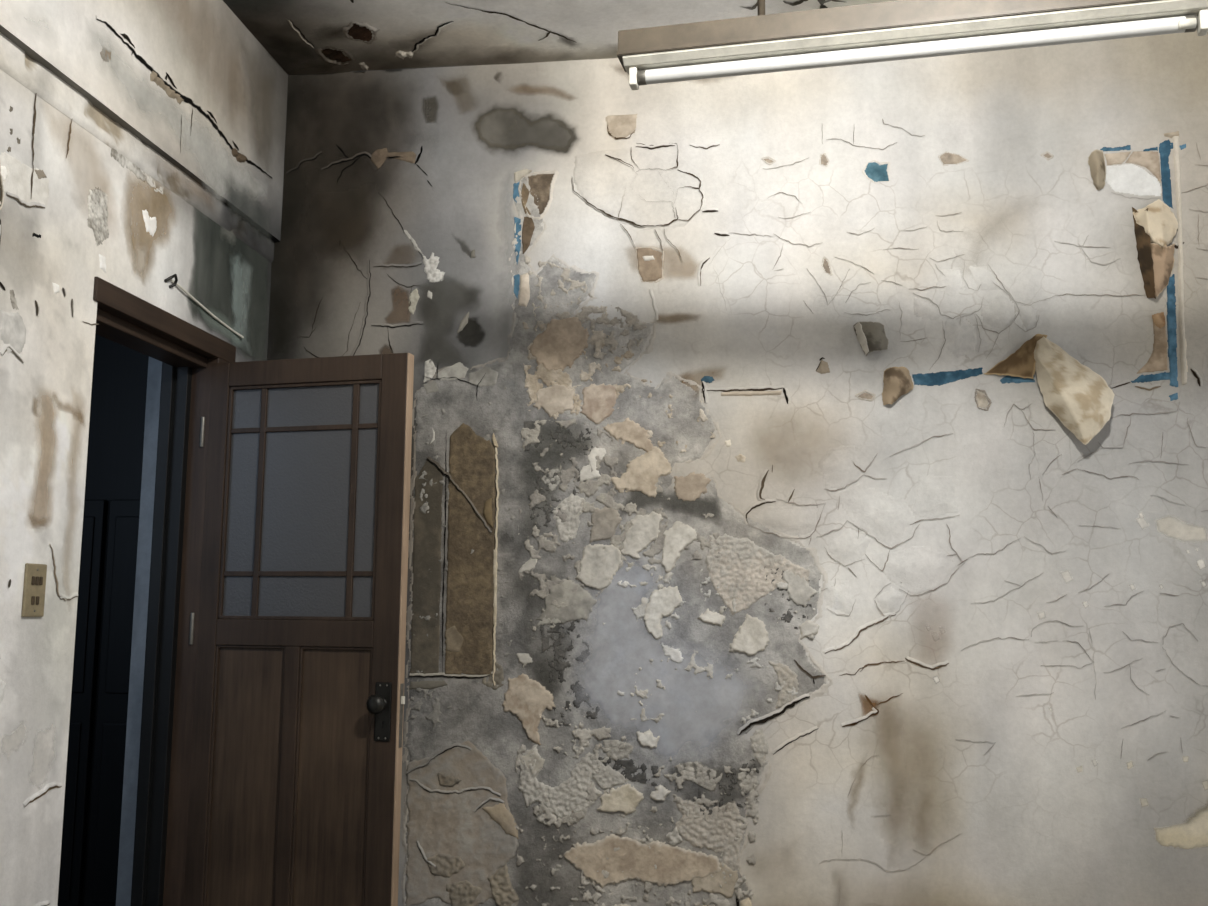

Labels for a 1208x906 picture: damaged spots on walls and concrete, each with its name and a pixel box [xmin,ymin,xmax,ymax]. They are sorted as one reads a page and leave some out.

crack [395,2,577,59]
crack [96,15,432,186]
leakage [424,97,438,122]
leakage [474,107,577,153]
flaking render [111,148,164,194]
peeling [1104,151,1161,200]
flaking render [87,187,109,246]
crack [697,119,1142,369]
leakage [402,230,485,382]
flaking render [401,169,833,906]
crack [737,433,1208,760]
leakage [862,697,877,714]